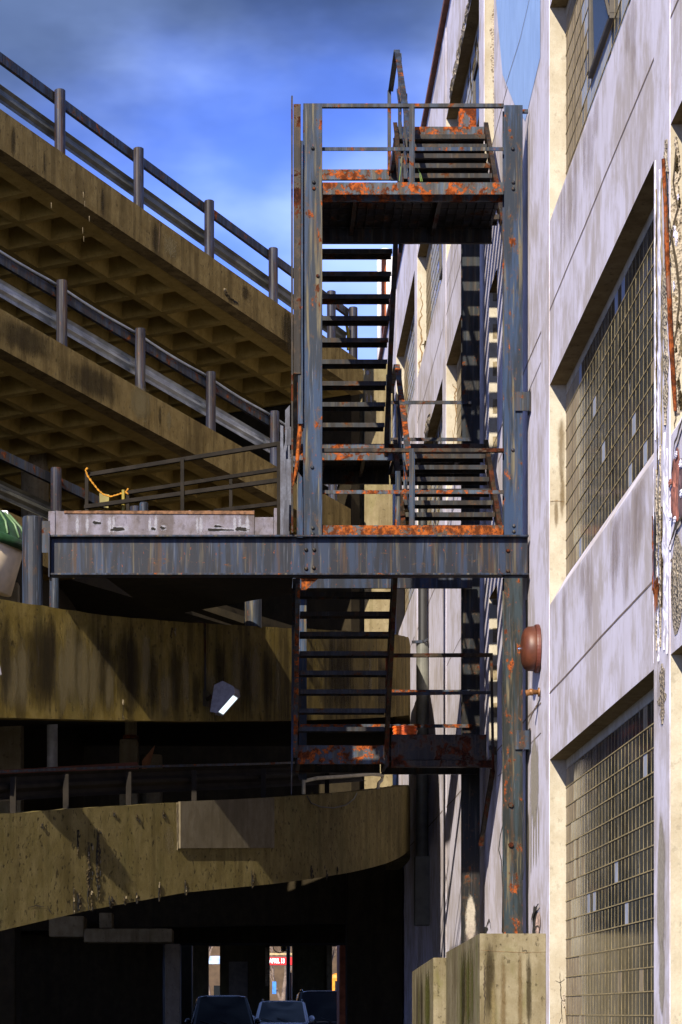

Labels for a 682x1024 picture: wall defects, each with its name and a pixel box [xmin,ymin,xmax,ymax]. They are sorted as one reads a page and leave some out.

corrosion [292,424,303,486]
water stain [0,623,279,711]
water stain [416,982,429,1024]
water stain [460,960,473,1024]
water stain [486,954,495,1024]